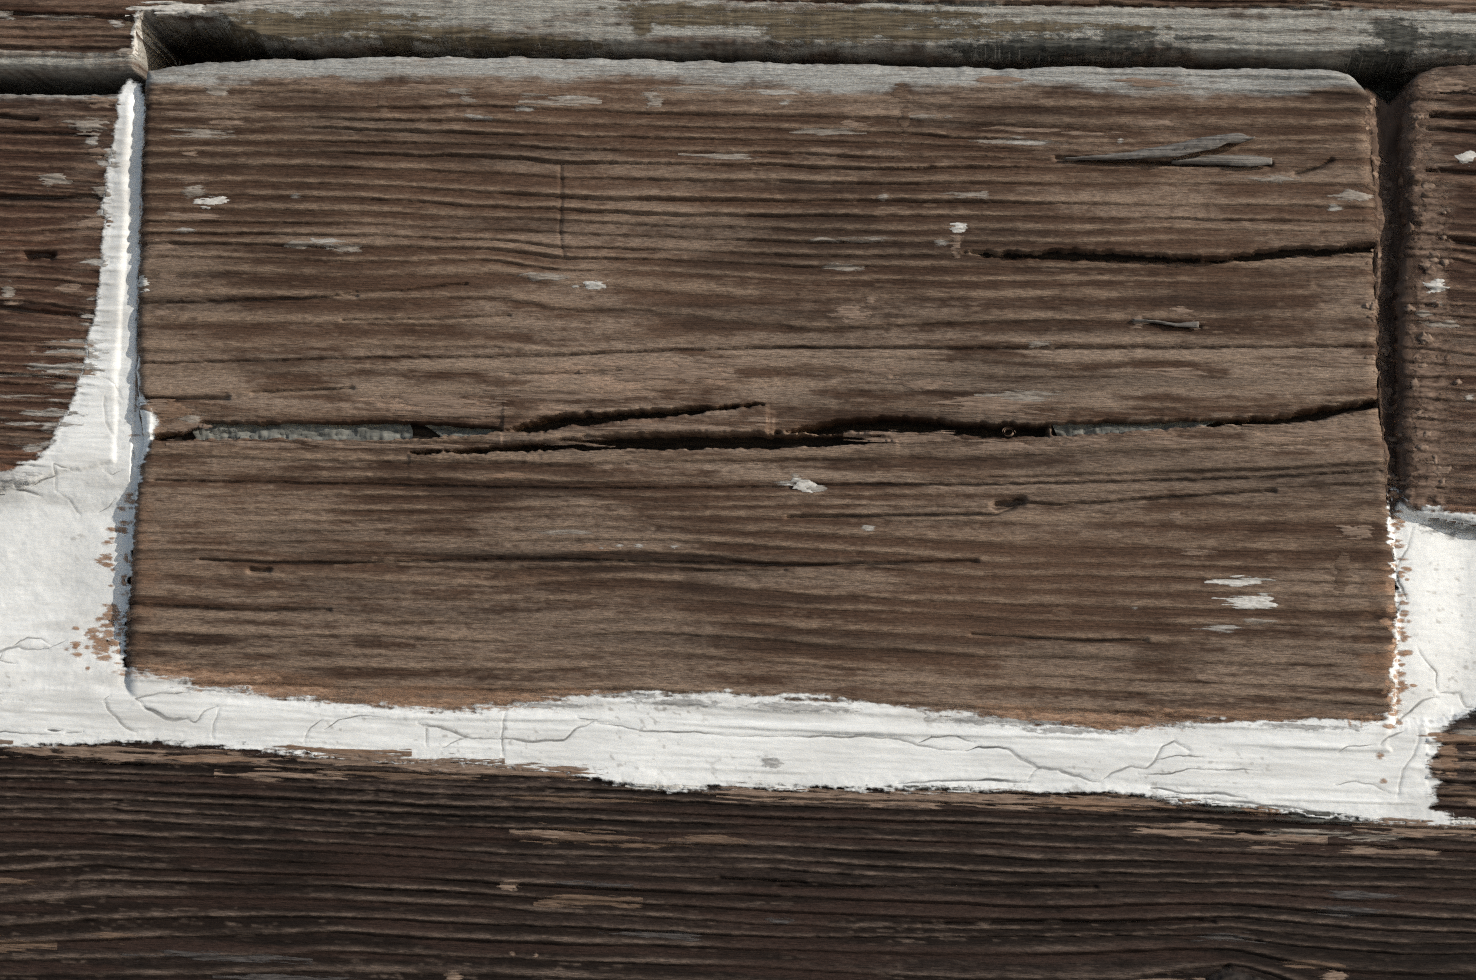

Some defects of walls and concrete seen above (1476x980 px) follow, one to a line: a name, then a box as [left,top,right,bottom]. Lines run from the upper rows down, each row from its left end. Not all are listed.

crack [978,245,1377,263]
crack [160,398,212,441]
crack [411,410,1057,454]
crack [1206,404,1373,427]
crack [815,471,1376,518]
crack [104,692,220,726]
crack [0,729,61,759]
crack [419,723,467,737]
crack [502,718,706,751]
crack [803,735,1011,783]